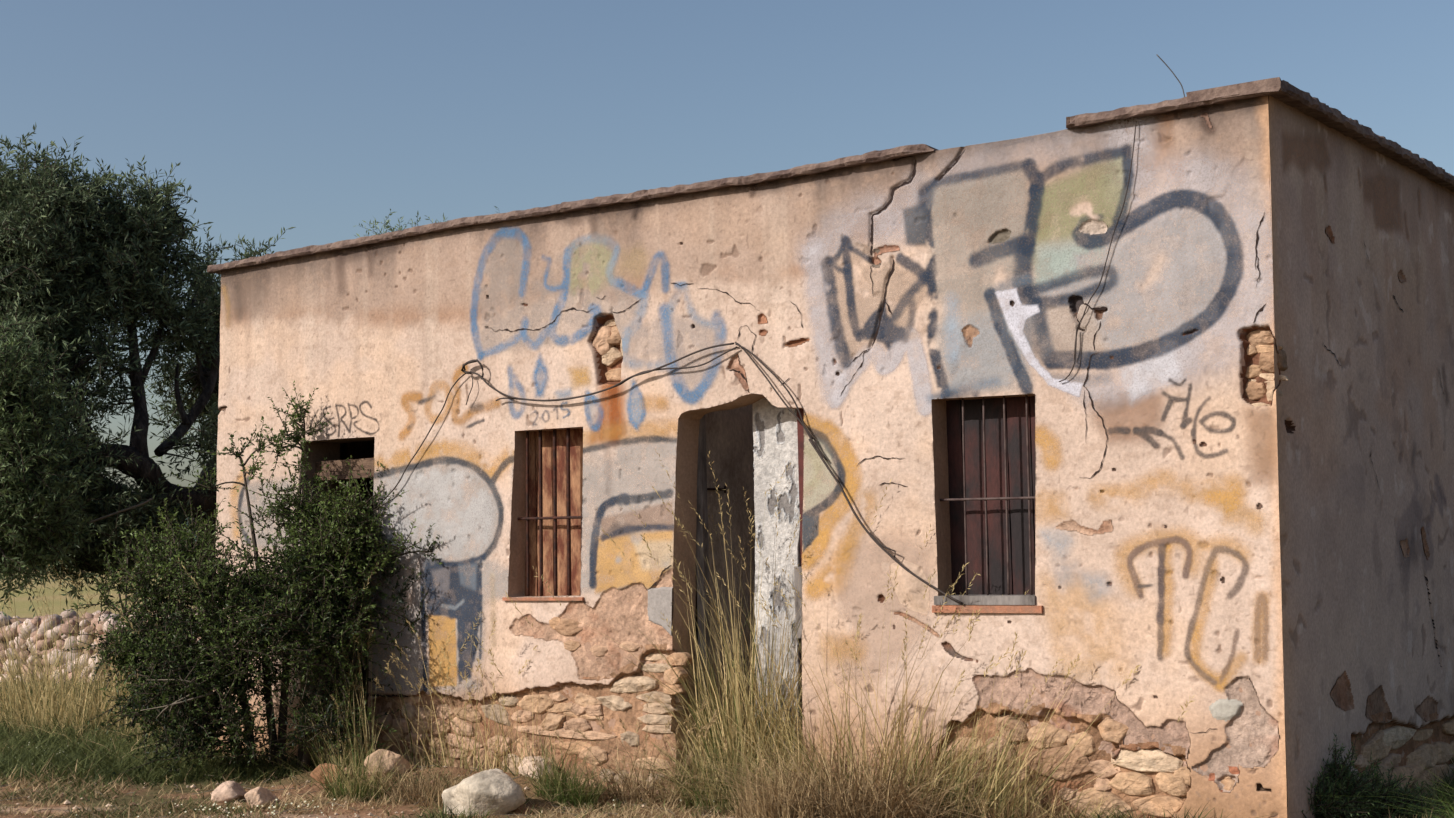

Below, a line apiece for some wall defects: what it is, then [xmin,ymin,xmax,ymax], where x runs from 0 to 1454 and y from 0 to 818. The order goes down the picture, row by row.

flaking render [590,315,623,384]
crack [841,150,965,394]
crack [1076,303,1108,478]
flaking render [1239,326,1290,407]
flaking render [367,568,692,794]
flaking render [878,595,1279,818]
flaking render [1330,671,1454,796]